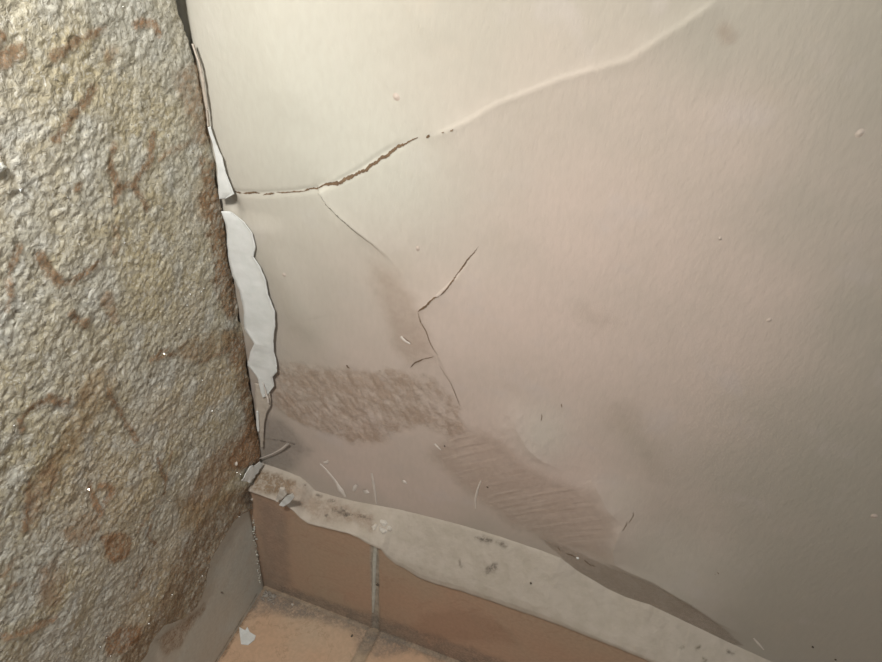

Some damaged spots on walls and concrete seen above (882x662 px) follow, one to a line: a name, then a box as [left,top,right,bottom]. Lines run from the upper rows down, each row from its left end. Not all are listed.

peeling [191,44,234,199]
crack [235,129,453,205]
peeling [221,211,277,448]
crack [403,249,477,403]